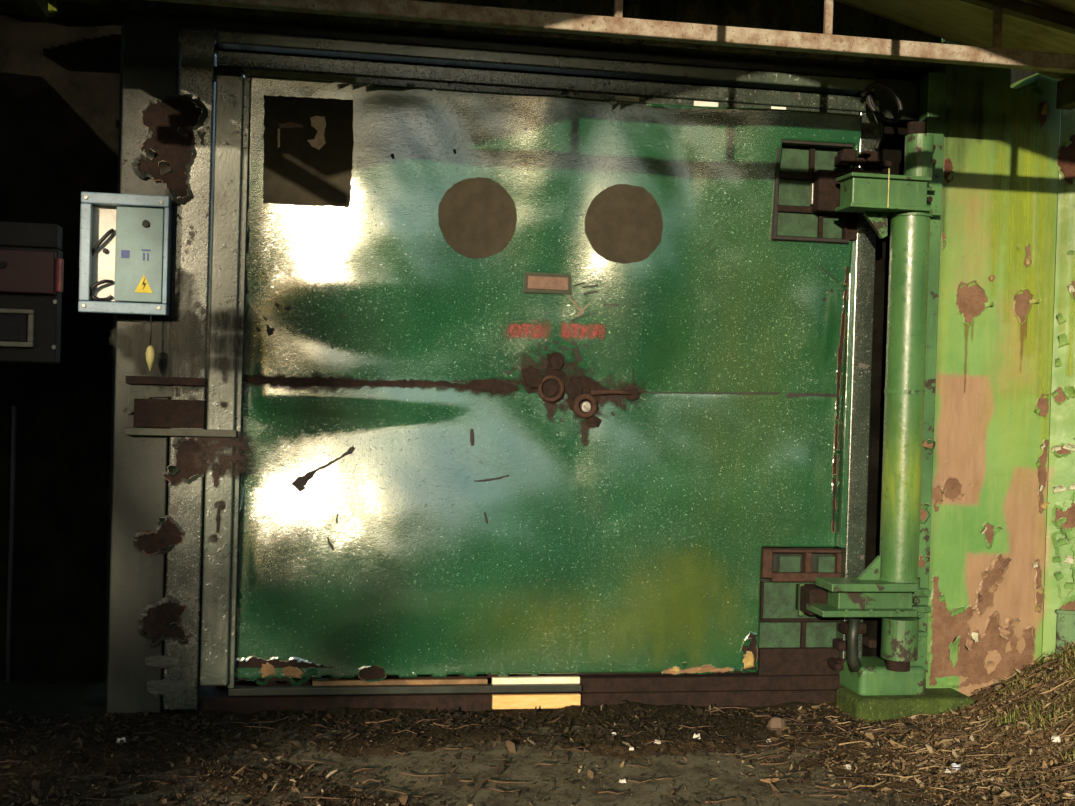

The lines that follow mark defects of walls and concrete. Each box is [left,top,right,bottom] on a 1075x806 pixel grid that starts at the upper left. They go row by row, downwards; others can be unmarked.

peeling [131,93,208,206]
peeling [1056,132,1075,185]
peeling [956,275,996,326]
peeling [1013,288,1041,325]
corrosion [544,354,644,445]
corrosion [190,434,252,487]
peeling [133,515,186,555]
corrosion [210,501,226,542]
peeling [920,476,965,524]
peeling [1033,438,1075,613]
peeling [919,521,1036,689]
peeling [138,595,193,697]